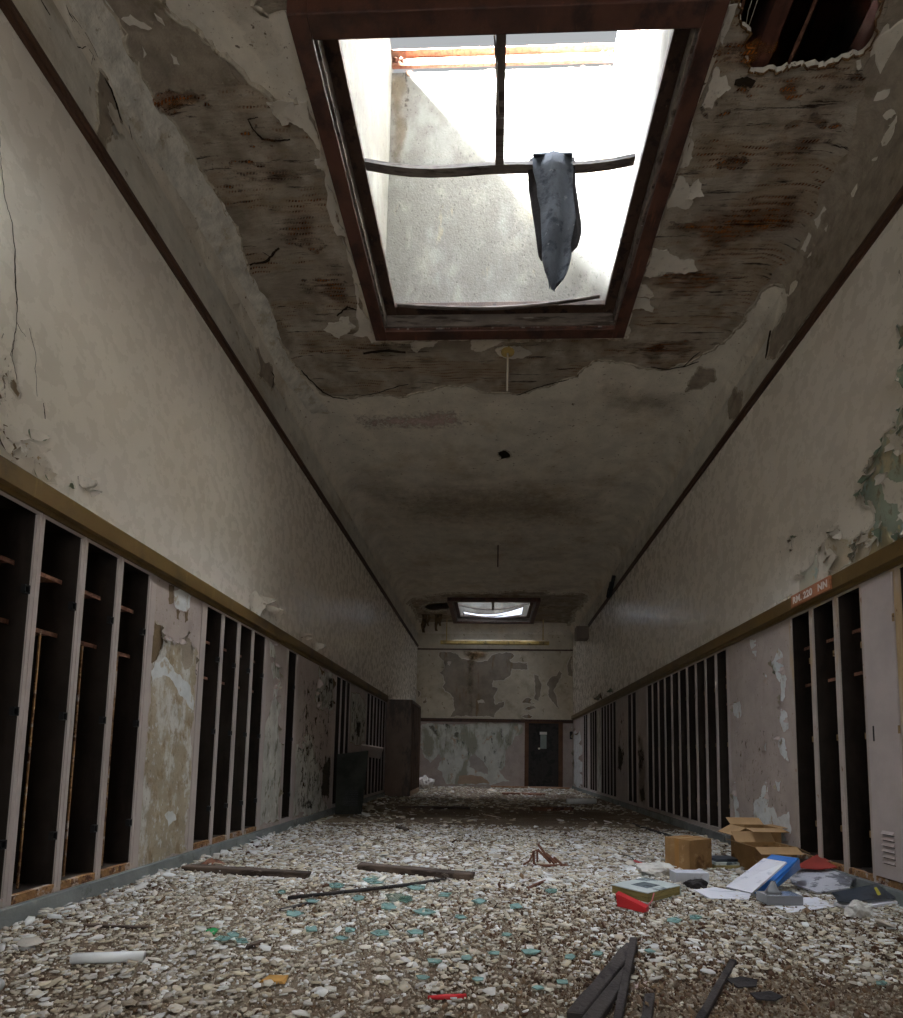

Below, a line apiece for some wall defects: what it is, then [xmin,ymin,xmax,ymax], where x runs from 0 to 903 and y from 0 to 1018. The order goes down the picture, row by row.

flaking render [94,67,124,152]
flaking render [103,0,903,399]
crack [0,142,46,419]
peeling [0,369,24,402]
peeling [0,424,103,497]
spalling [497,449,512,460]
peeling [773,403,903,606]
peeling [138,584,200,867]
peeling [747,637,790,763]
peeling [730,779,740,817]
peeling [753,779,792,843]